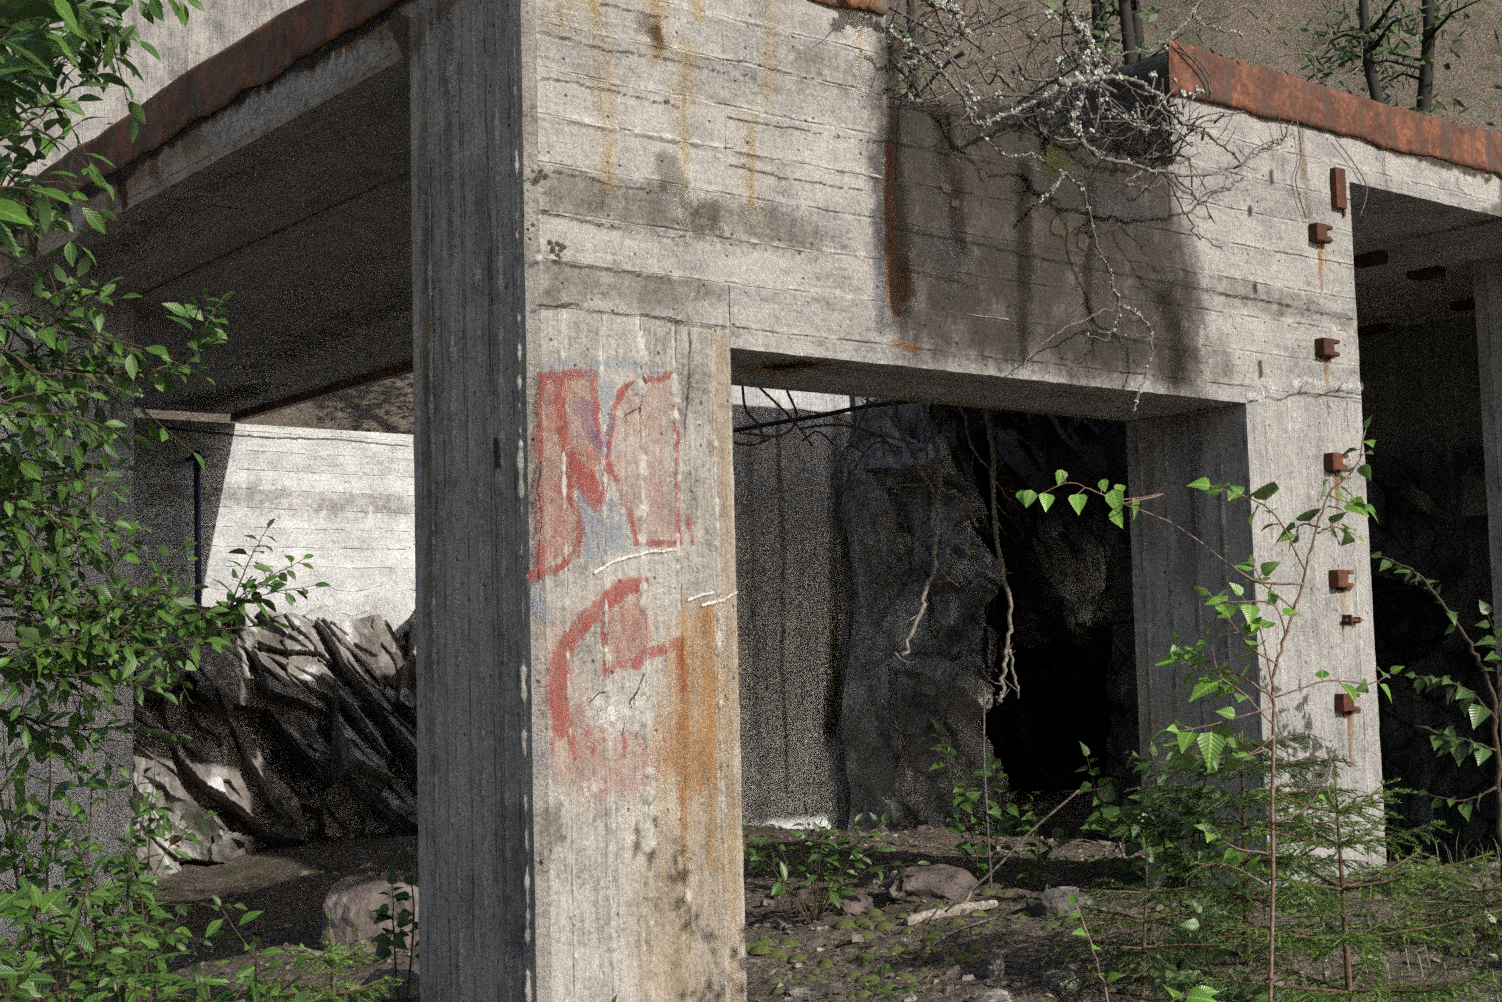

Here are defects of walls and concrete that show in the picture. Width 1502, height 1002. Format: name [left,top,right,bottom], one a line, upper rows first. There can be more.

rust [886,139,911,315]
water stain [878,65,1198,385]